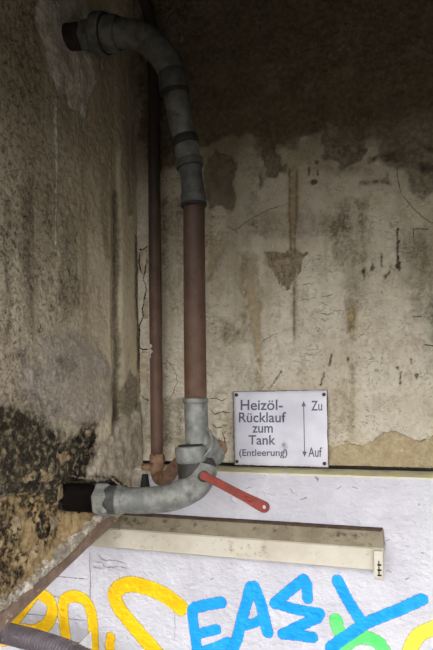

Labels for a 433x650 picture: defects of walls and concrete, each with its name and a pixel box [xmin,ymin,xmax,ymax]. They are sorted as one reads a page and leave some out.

crack [396,169,433,238]
crack [138,246,149,401]
water stain [0,329,138,595]
spalling [328,431,433,468]